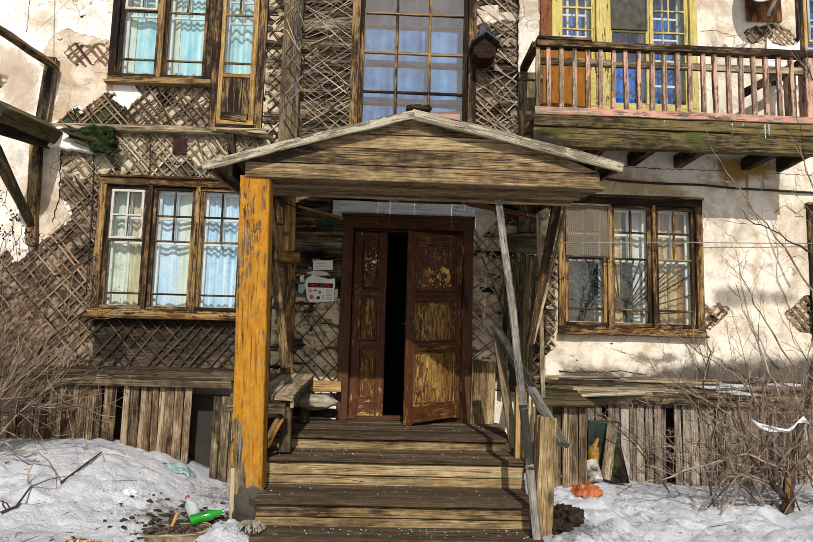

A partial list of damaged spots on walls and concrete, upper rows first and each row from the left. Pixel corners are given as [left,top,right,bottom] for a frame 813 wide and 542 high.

flaking render [40,29,114,122]
flaking render [39,148,71,242]
damp [715,159,771,184]